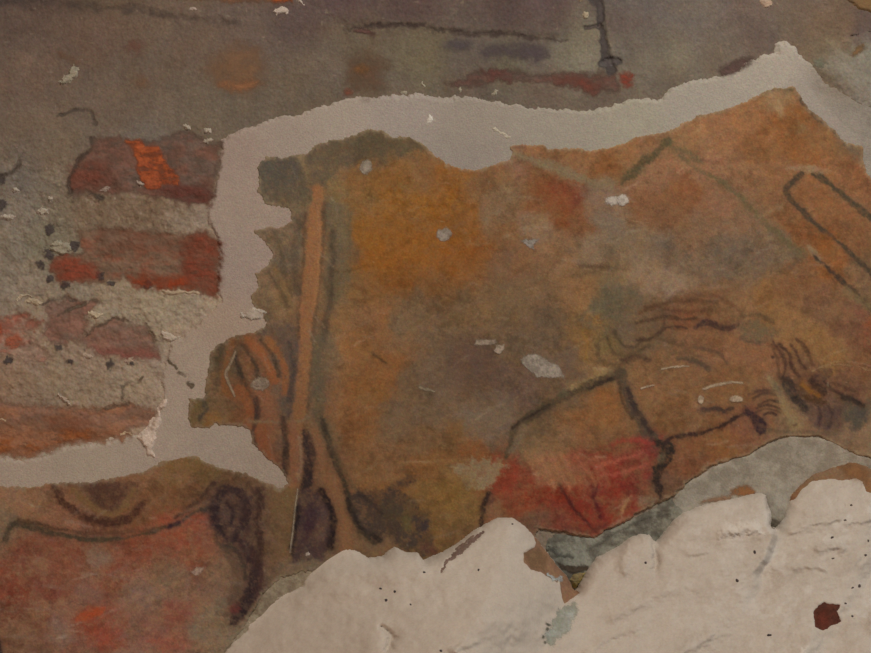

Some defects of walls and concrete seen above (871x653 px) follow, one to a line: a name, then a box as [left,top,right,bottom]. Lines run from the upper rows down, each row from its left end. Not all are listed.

flaking render [719,58,752,76]
flaking render [451,69,633,96]
peeling [360,160,372,174]
peeling [606,194,629,206]
peeling [437,228,452,241]
peeling [240,307,267,321]
peeling [474,340,504,354]
peeling [522,354,564,378]
peeling [790,462,871,501]
peeling [440,531,485,573]
peeling [524,537,586,603]